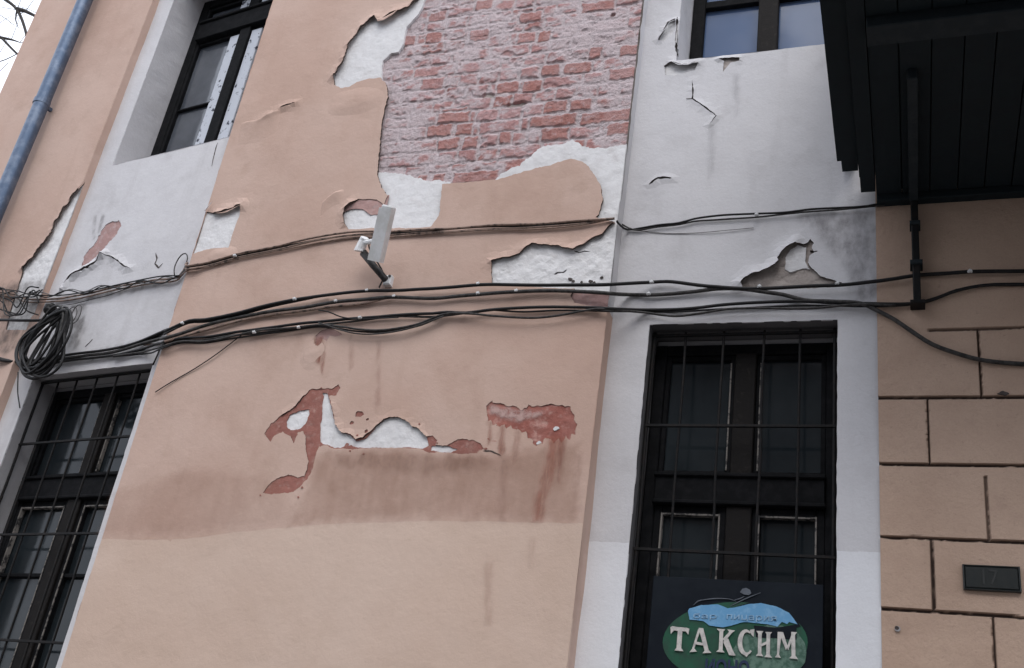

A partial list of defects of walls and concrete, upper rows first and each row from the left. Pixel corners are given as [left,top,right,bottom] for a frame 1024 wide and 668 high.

spalling [657,18,698,76]
crack [687,83,716,116]
flaking render [334,0,643,307]
flaking render [7,186,83,330]
peeling [82,221,121,266]
peeling [194,202,240,253]
spalling [741,240,836,289]
peeling [260,385,501,498]
peeling [486,401,577,446]